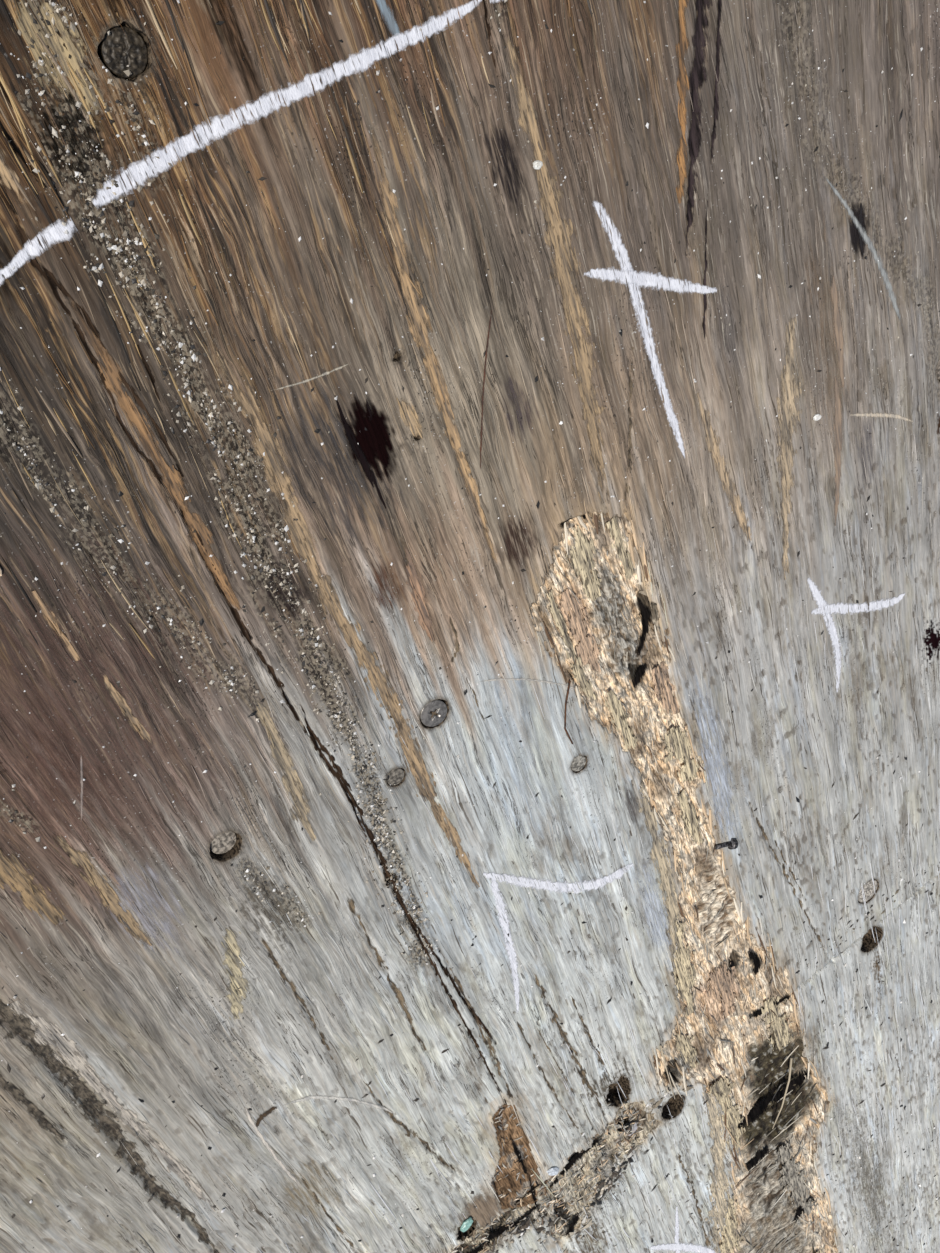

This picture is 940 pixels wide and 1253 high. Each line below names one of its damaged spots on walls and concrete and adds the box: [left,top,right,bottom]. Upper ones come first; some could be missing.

crack [686,0,722,338]
water stain [335,396,386,509]
peeling [372,130,497,562]
spalling [505,37,838,1253]
spalling [450,1101,662,1253]